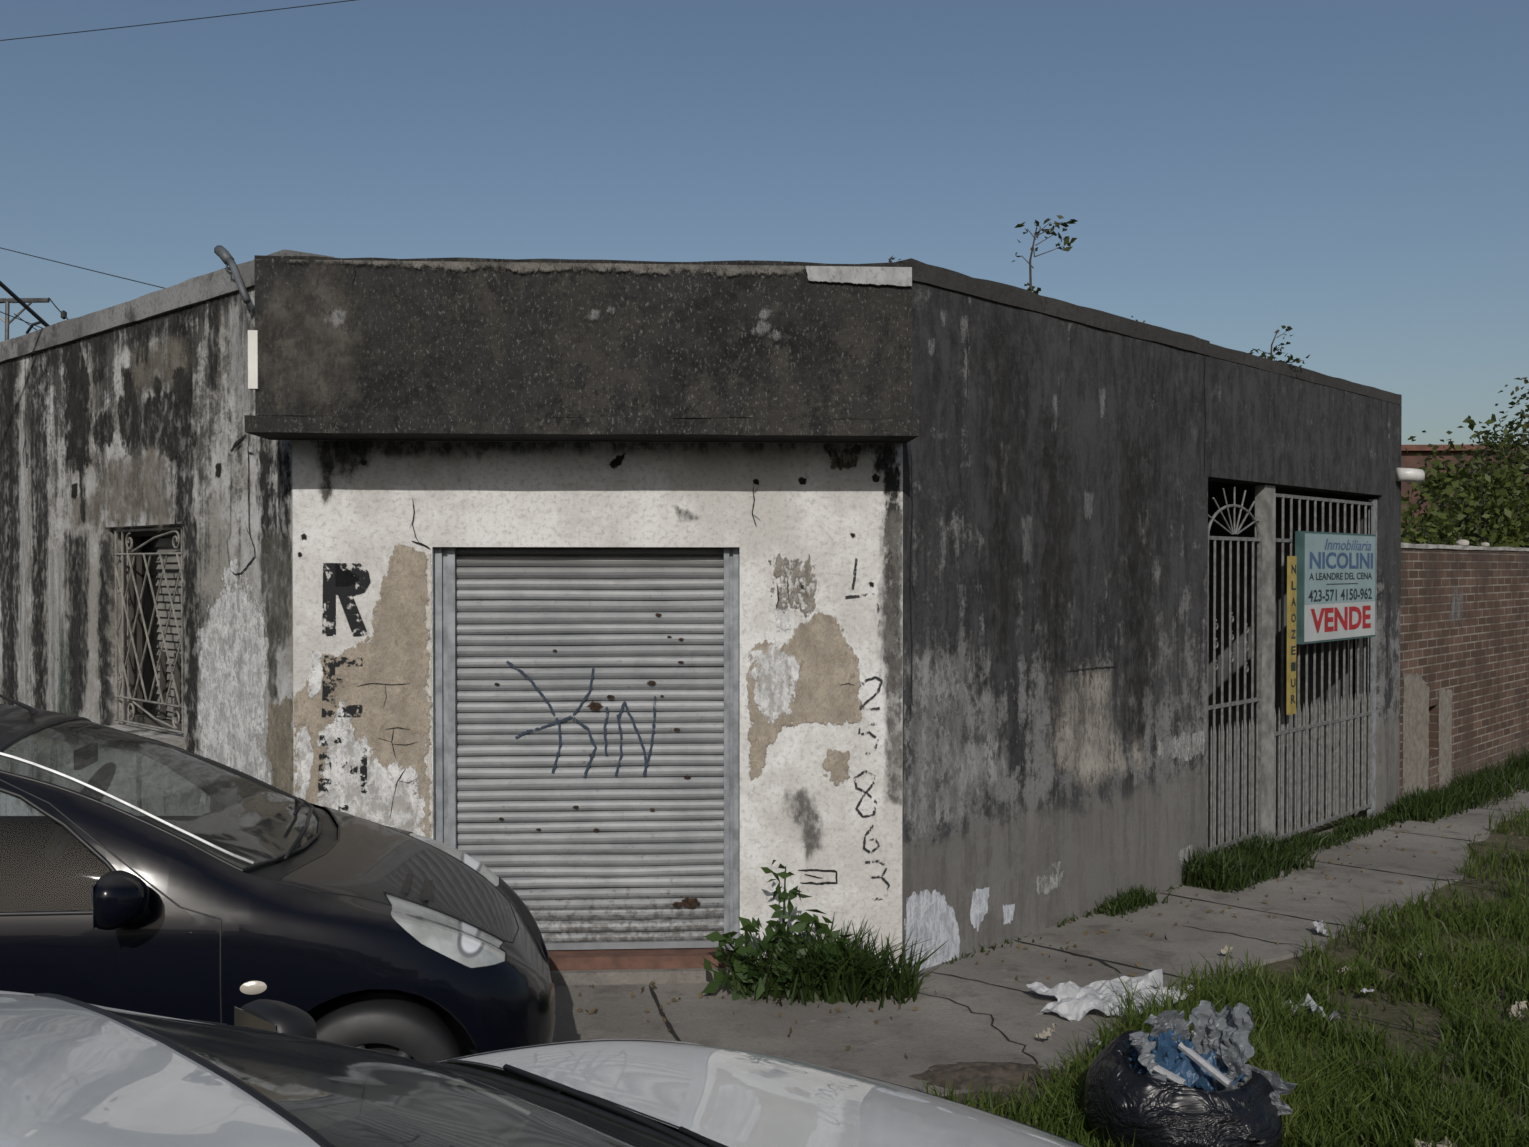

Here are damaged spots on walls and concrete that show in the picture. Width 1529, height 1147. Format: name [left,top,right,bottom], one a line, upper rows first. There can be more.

damp [0,292,237,753]
damp [256,437,292,700]
peeling [194,544,434,839]
peeling [746,553,862,780]
peeling [822,749,850,786]